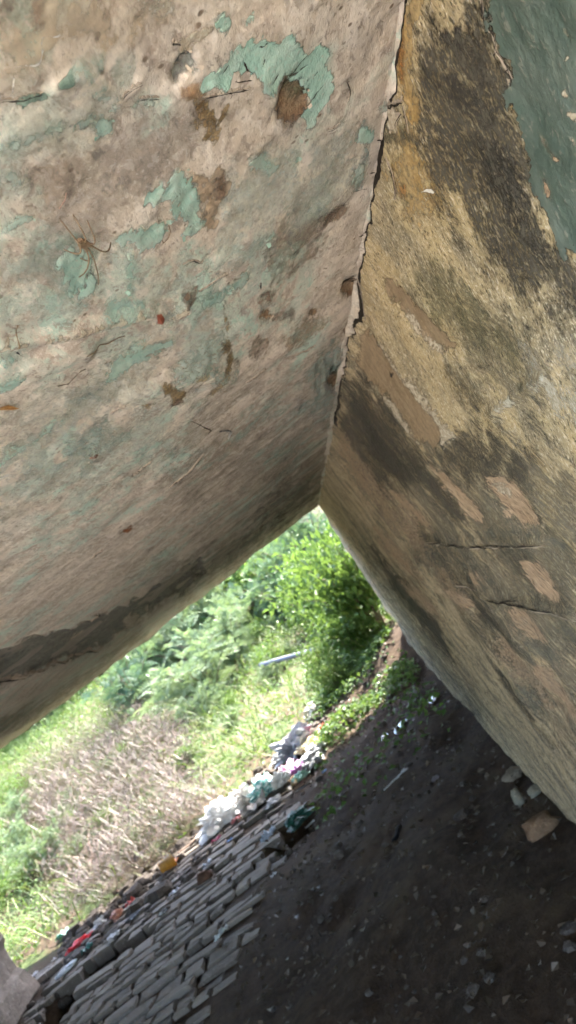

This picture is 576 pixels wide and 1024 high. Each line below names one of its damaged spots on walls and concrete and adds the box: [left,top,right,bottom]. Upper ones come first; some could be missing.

peeling [171,11,335,129]
crack [327,79,351,132]
peeling [46,169,206,345]
crack [334,0,409,427]
damp [382,0,576,342]
flaking render [299,324,456,449]
damp [527,375,576,424]
damp [333,367,556,722]
crack [423,542,543,550]
flaking render [485,476,540,529]
crack [455,585,576,622]
flaking render [519,560,561,604]